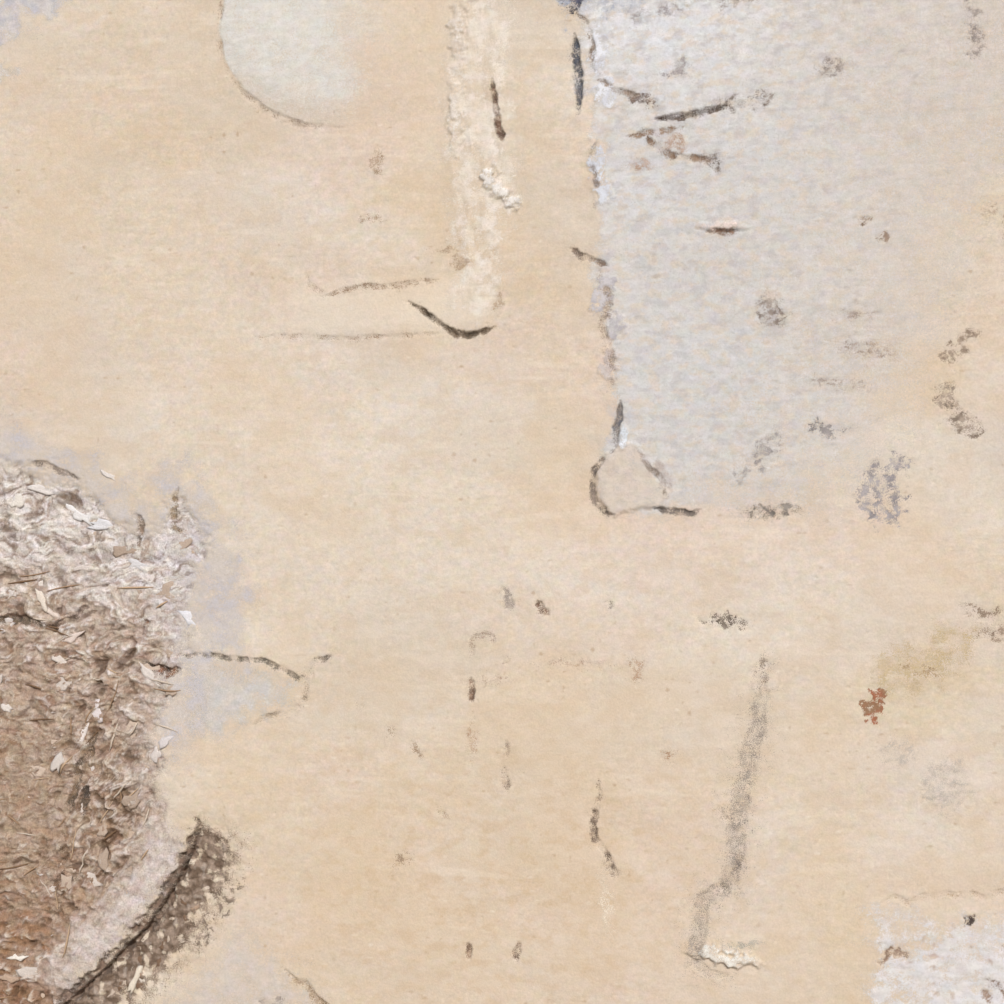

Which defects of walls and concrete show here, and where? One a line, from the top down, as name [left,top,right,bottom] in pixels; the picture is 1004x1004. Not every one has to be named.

crack [217,1,319,129]
crack [260,276,496,342]
flaking render [0,459,209,1004]
crack [178,650,332,725]
rust [859,688,887,724]
crack [676,652,788,989]
flaking render [189,871,246,952]